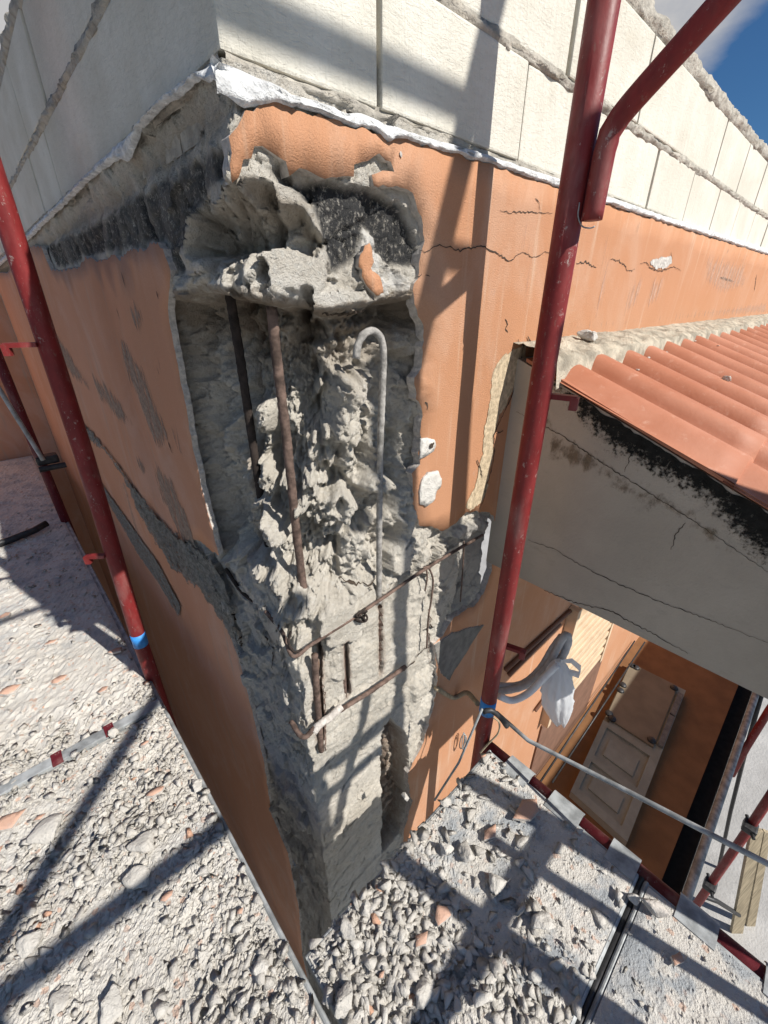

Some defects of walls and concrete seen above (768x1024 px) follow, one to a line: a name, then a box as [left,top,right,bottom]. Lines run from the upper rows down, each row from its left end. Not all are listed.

crack [502,198,552,214]
crack [414,244,549,279]
crack [577,255,678,272]
spalling [173,170,442,621]
crack [546,427,763,568]
leakage [552,383,768,558]
peeling [432,625,484,681]
crack [544,590,688,654]
crack [534,542,765,642]
spalling [379,718,410,855]